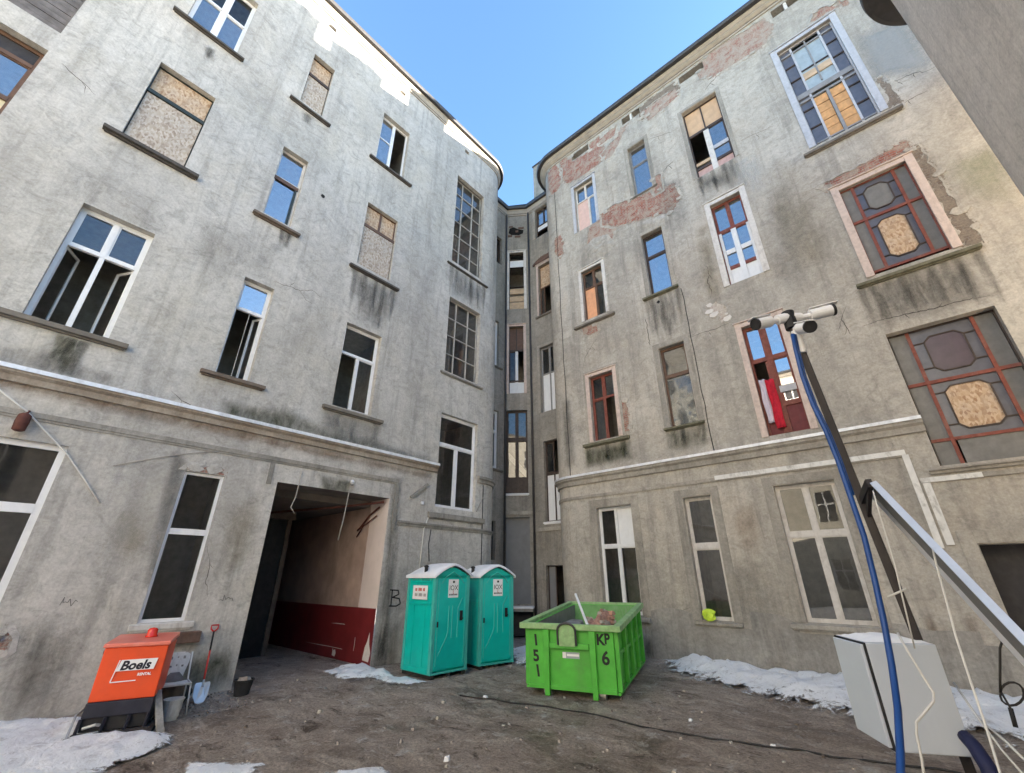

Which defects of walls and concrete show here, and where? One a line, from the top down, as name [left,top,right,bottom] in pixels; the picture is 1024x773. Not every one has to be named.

flaking render [547,80,681,198]
flaking render [585,172,684,246]
flaking render [815,139,991,249]
flaking render [705,299,733,326]